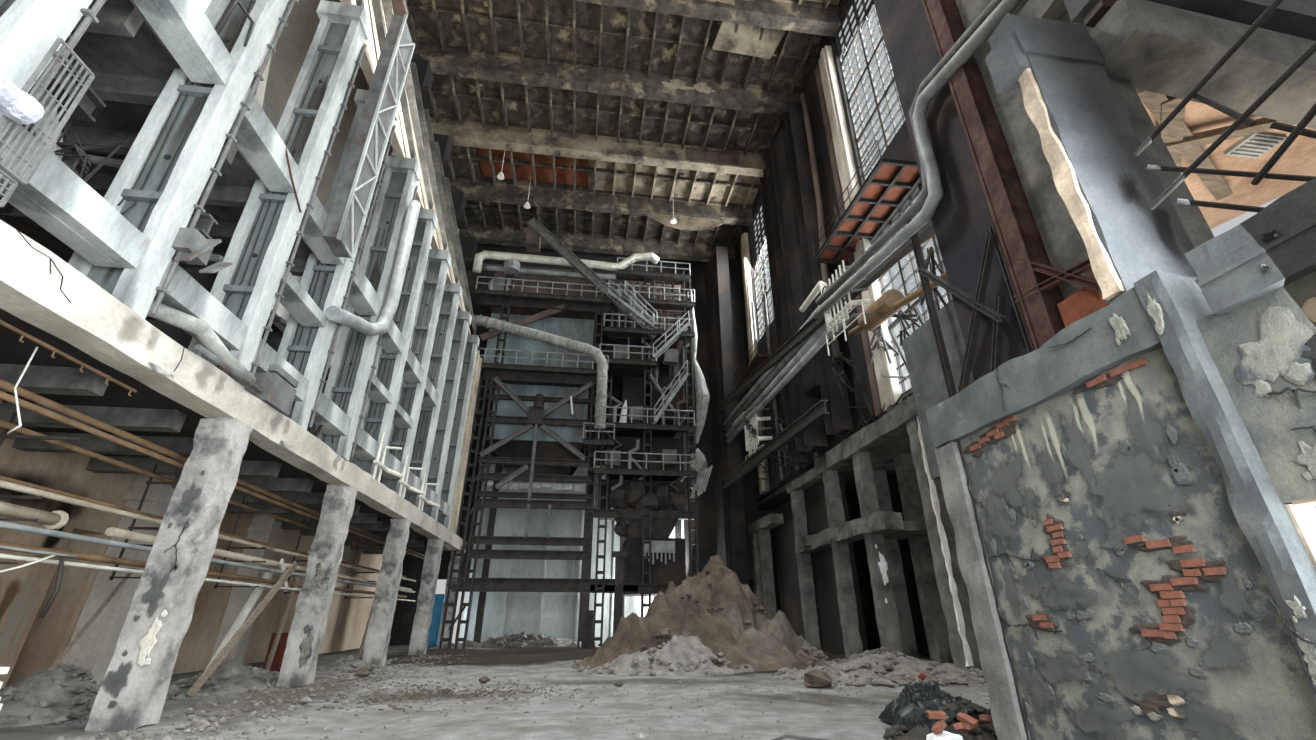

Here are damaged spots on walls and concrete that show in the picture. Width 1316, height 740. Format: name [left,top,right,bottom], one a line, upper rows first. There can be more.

peeling [1234,297,1316,398]
flaking render [1071,358,1148,395]
water stain [1119,375,1142,412]
flaking render [963,415,1023,457]
water stain [1012,429,1028,461]
water stain [1042,418,1064,467]
water stain [1074,399,1096,443]
peeling [1293,441,1316,481]
peeling [982,397,1262,740]